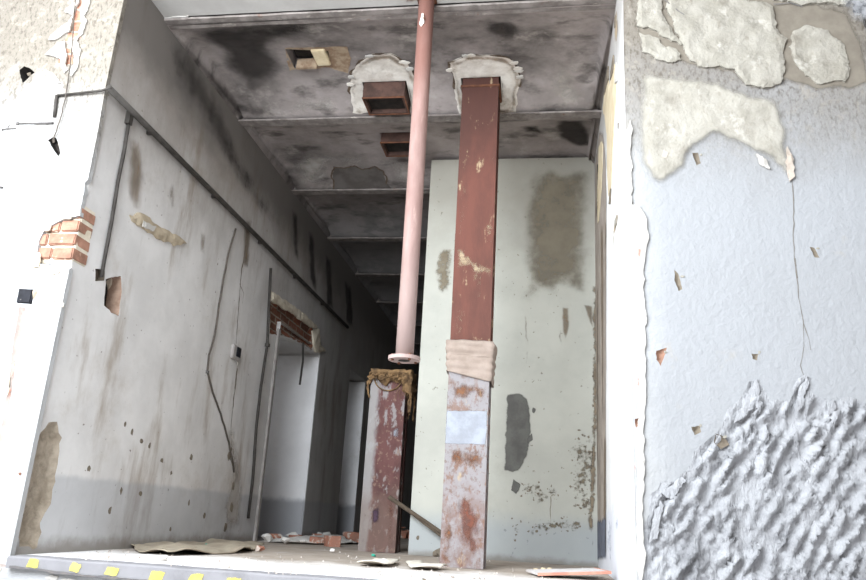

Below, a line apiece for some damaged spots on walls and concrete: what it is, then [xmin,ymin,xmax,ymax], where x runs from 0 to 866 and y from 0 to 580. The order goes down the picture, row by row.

peeling [1,0,91,140]
leakage [491,23,515,37]
flaking render [32,206,122,316]
flaking render [270,291,326,353]
leakage [530,174,582,286]
spalling [596,0,866,580]
crack [792,183,811,375]
spalling [18,422,62,549]
rust [453,453,479,464]
rust [455,386,482,397]
rust [460,501,477,550]
leakage [504,394,536,493]